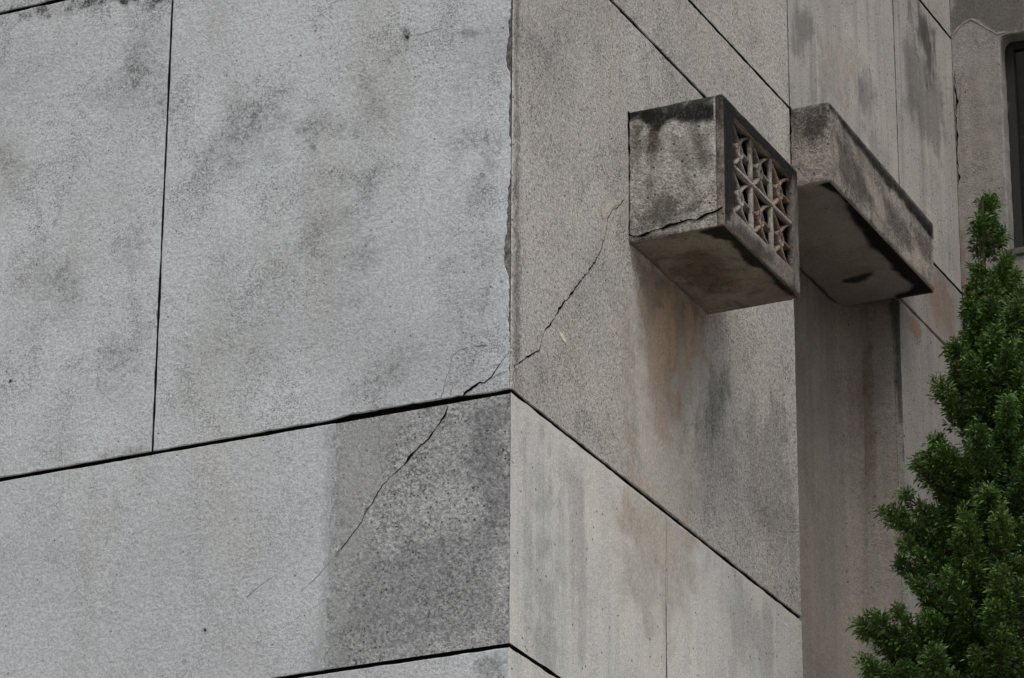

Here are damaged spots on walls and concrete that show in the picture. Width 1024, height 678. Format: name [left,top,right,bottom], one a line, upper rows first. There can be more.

crack [303,111,723,589]
water stain [630,95,797,298]
water stain [791,44,934,408]